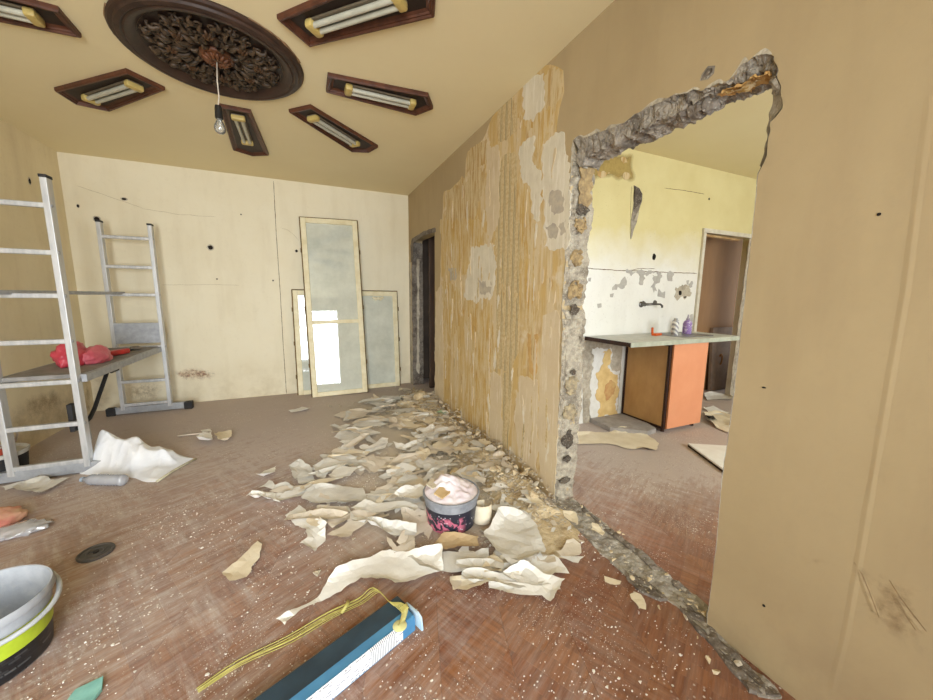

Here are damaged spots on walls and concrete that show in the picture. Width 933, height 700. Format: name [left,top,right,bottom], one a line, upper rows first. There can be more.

spalling [700,66,715,81]
flaking render [440,73,572,406]
flaking render [594,156,642,239]
peeling [610,253,693,300]
spalling [730,238,751,396]
flaking render [582,338,622,423]
peeling [548,612,690,700]